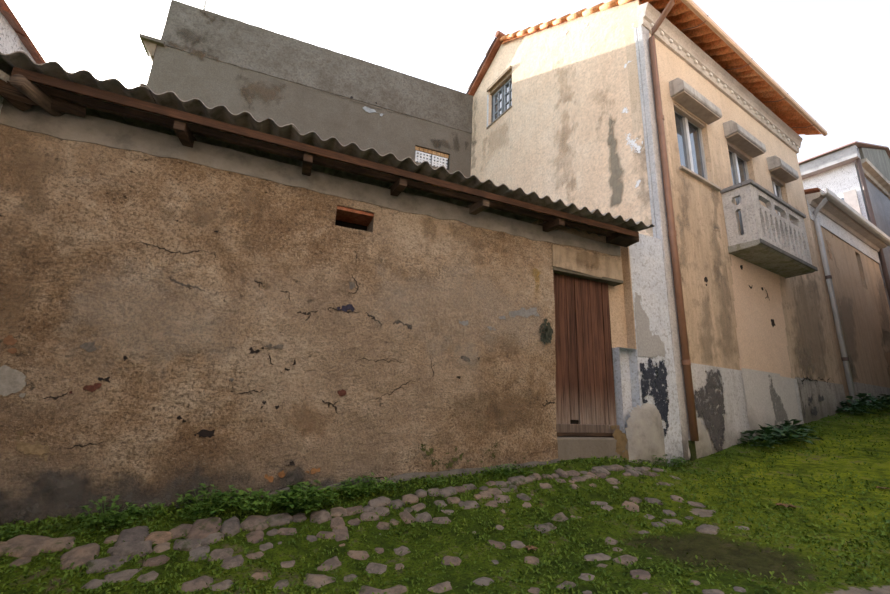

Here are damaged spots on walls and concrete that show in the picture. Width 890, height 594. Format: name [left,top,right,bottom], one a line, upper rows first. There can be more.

damp [608,119,623,207]
peeling [625,133,643,153]
crack [138,242,216,259]
crack [254,251,408,326]
spalling [194,429,215,438]
crack [355,356,434,399]
peeling [634,292,669,436]
peeling [694,369,725,452]